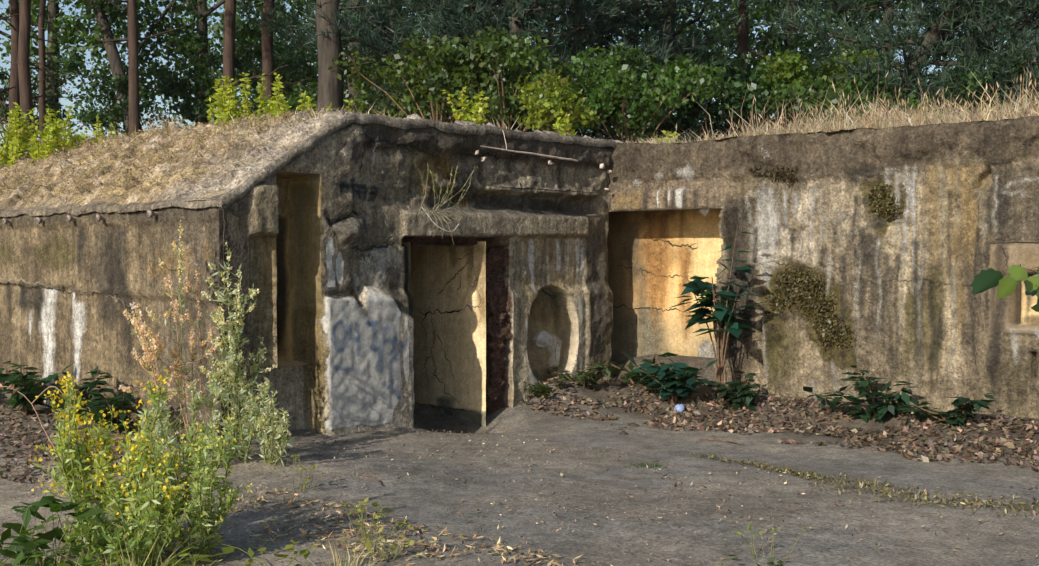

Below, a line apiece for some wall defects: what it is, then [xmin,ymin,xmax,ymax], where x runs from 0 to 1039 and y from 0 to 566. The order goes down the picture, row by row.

water stain [726,190,798,347]
crack [739,261,971,295]
water stain [853,168,941,363]
crack [980,176,1039,267]
efflorescence [72,293,84,382]
crack [416,250,483,412]
water stain [989,287,1017,379]